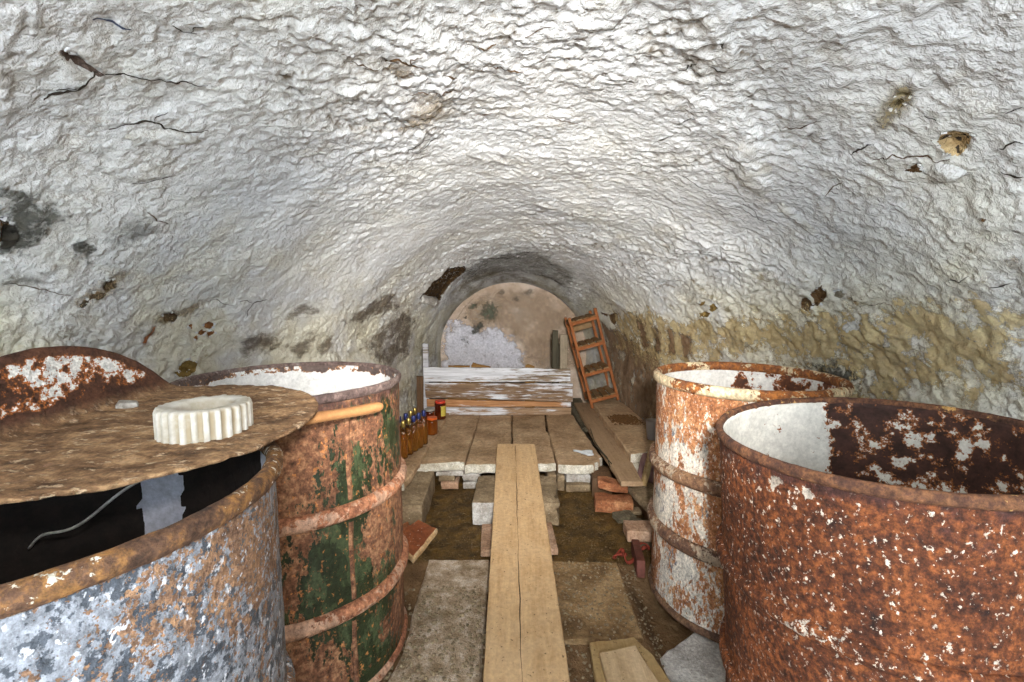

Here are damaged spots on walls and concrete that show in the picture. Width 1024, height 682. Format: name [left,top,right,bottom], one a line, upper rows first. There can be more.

crack [44,71,208,100]
crack [109,112,208,133]
spalling [936,131,976,159]
water stain [0,187,72,256]
spalling [799,285,845,312]
water stain [351,294,415,364]
water stain [243,333,332,357]
water stain [601,290,1024,422]